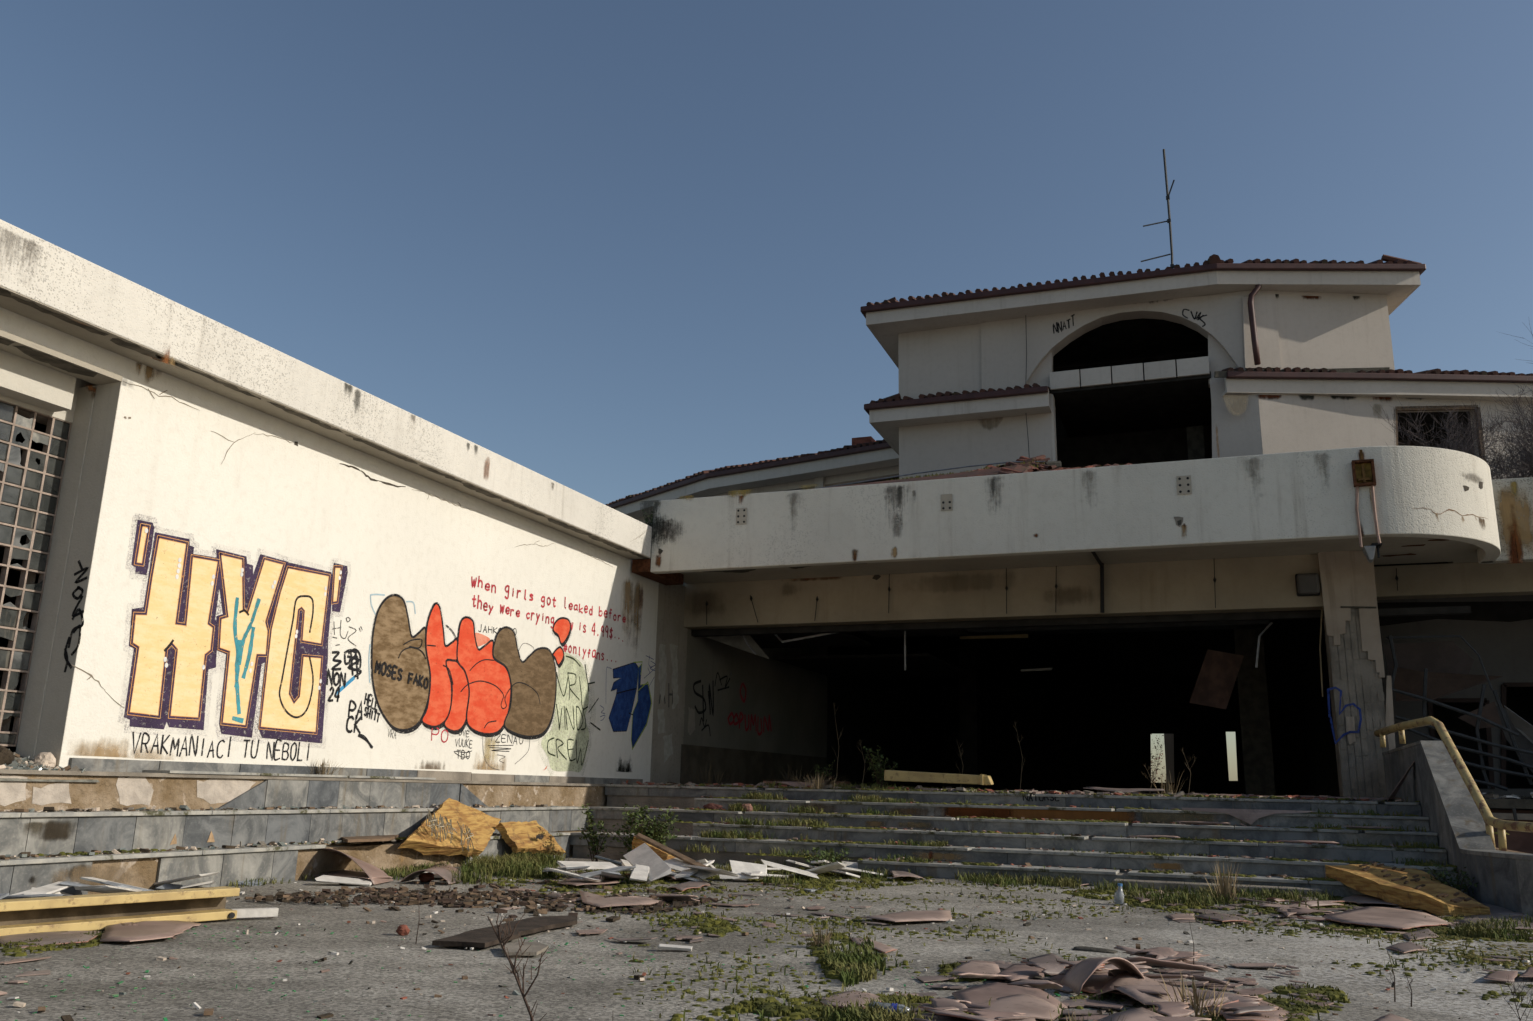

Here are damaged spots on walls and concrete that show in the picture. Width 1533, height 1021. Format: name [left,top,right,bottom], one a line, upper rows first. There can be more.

crack [123,381,292,464]
crack [340,463,472,511]
damp [642,500,679,544]
crack [1414,507,1487,522]
corrosion [1479,482,1533,564]